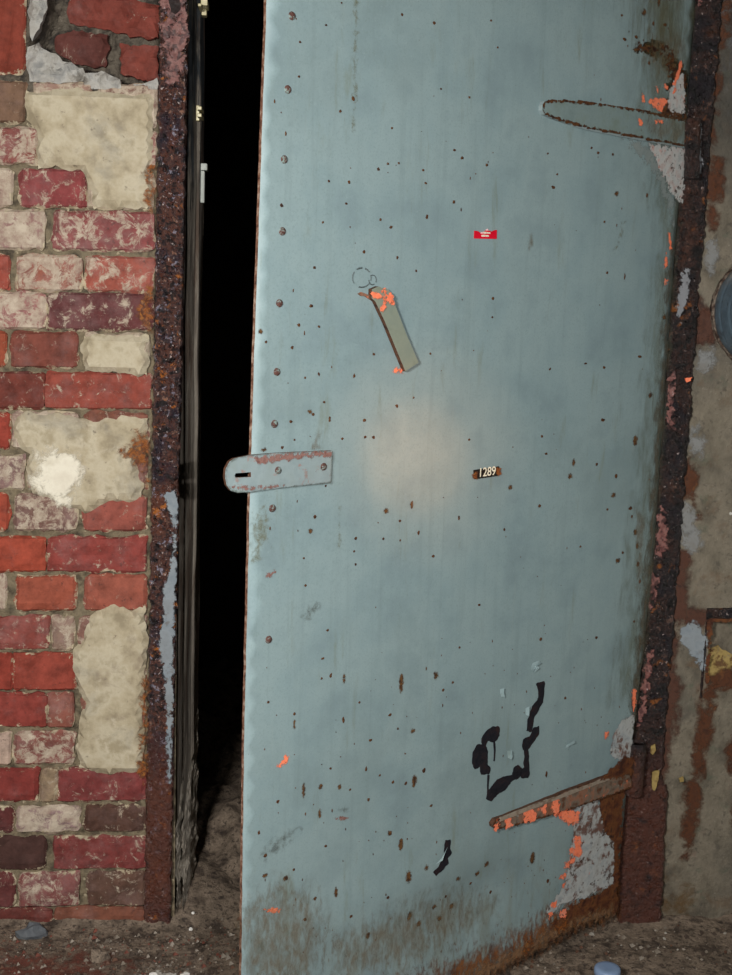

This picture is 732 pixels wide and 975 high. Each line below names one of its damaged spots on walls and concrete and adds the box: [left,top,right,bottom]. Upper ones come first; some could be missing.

peeling [25,0,190,210]
corrosion [543,35,689,146]
peeling [642,61,686,124]
corrosion [705,156,726,231]
corrosion [254,439,333,464]
peeling [494,138,719,941]
corrosion [683,458,702,520]
corrosion [136,678,149,785]
peeling [472,661,545,801]
corrosion [661,550,732,860]
corrosion [493,776,632,833]
corrosion [418,899,613,975]